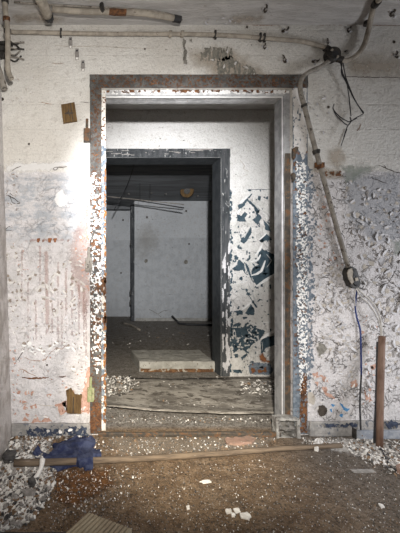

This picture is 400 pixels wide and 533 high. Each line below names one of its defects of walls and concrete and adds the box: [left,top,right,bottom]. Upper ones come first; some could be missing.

rust [93,76,305,94]
peeling [200,46,256,74]
peeling [6,88,376,437]
rust [293,161,307,281]
peeling [344,181,400,373]
rust [294,287,308,433]